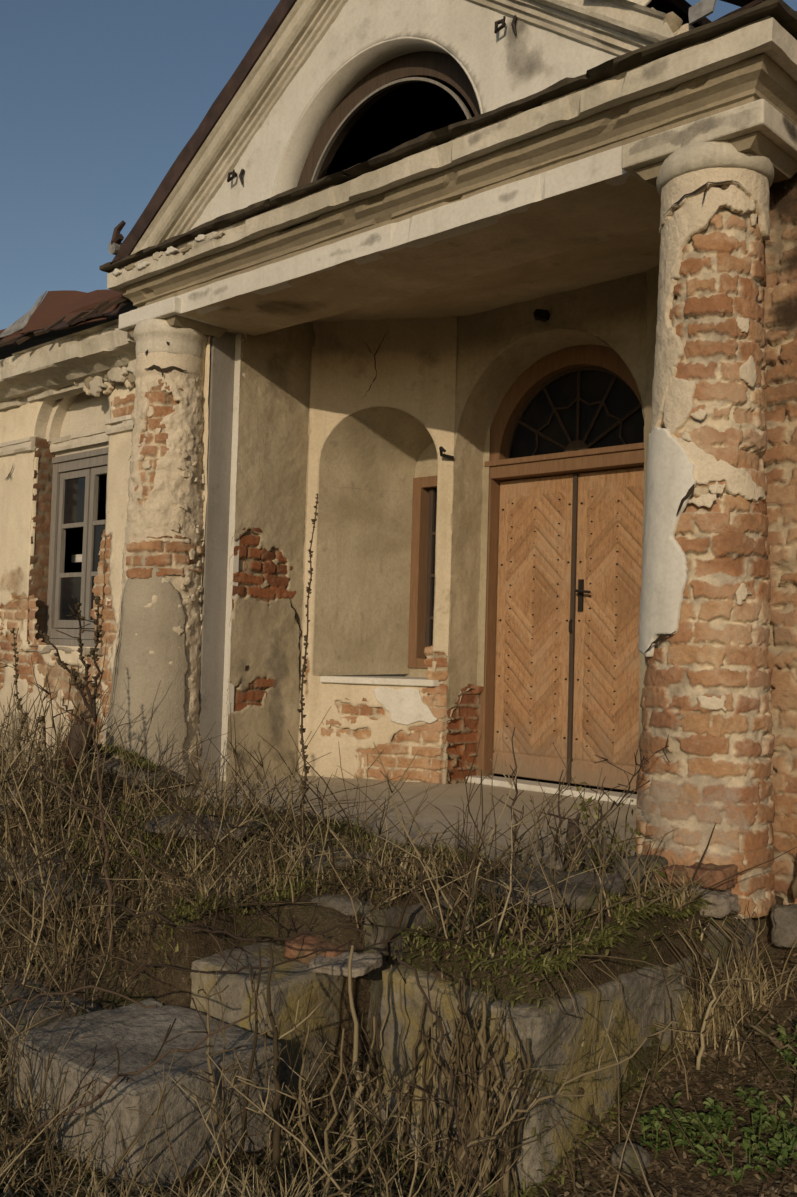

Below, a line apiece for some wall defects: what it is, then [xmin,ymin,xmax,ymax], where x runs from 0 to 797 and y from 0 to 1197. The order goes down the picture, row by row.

spalling [111,379,205,505]
flaking render [638,167,770,657]
spalling [0,529,117,745]
spalling [126,504,205,635]
spalling [224,665,277,717]
spalling [229,527,296,637]
spalling [321,646,483,784]
flaking render [697,695,727,712]